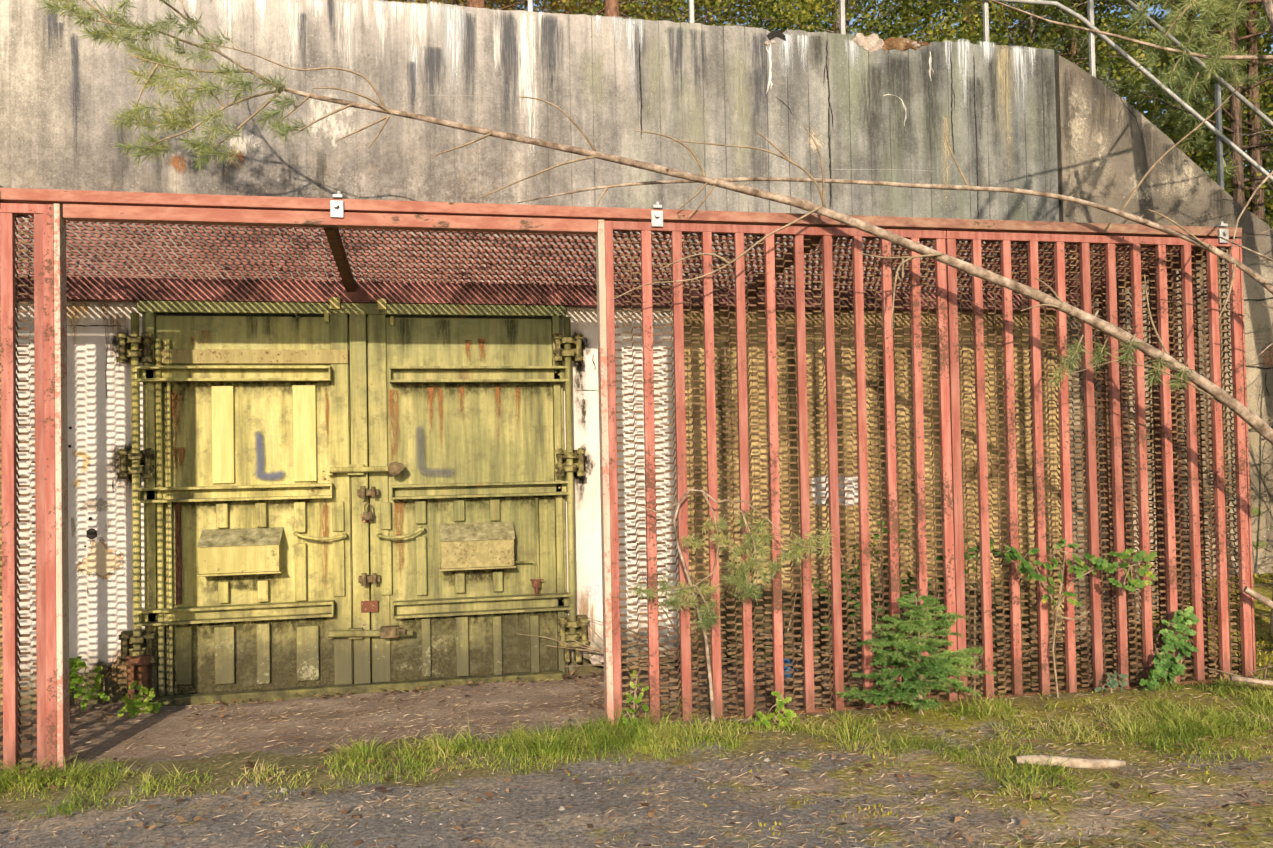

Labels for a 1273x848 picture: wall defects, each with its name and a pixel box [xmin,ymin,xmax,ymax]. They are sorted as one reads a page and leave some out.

leakage [47,5,79,113]
leakage [284,0,475,108]
leakage [494,11,561,137]
leakage [596,15,704,87]
leakage [753,36,766,123]
leakage [782,34,821,66]
spalling [852,33,930,52]
leakage [922,40,996,181]
rust [466,338,485,357]
rust [162,388,185,465]
rust [428,386,443,431]
peeling [75,537,124,580]